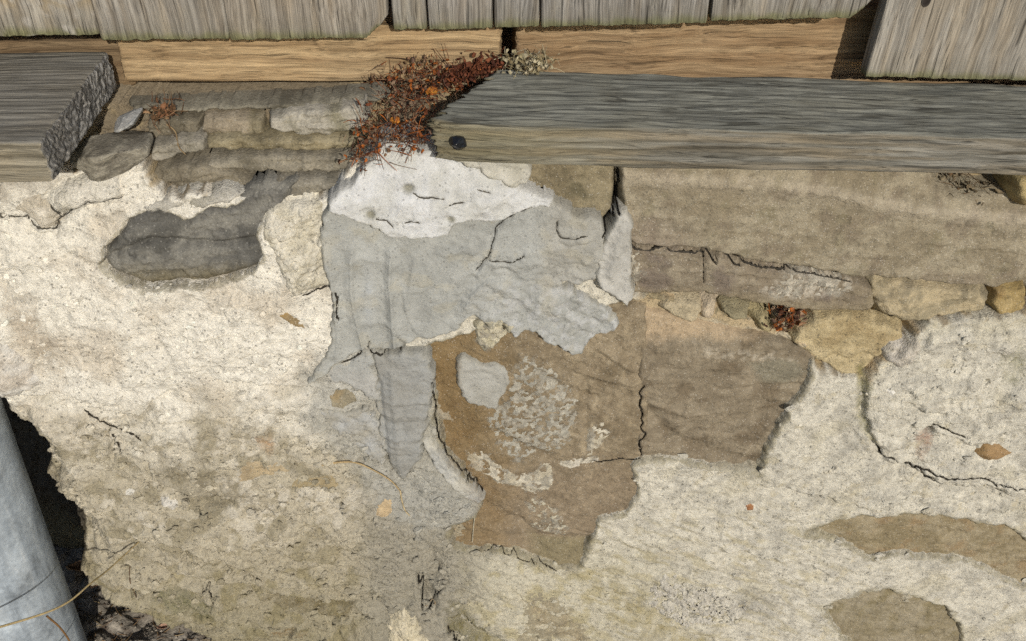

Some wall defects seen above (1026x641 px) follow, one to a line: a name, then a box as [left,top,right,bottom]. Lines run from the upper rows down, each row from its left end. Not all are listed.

crack [0,195,123,230]
spalling [106,169,300,282]
crack [632,244,852,283]
spalling [429,193,815,565]
crack [591,385,646,463]
crack [876,444,1026,492]
spalling [819,508,1026,583]
spalling [824,588,960,641]